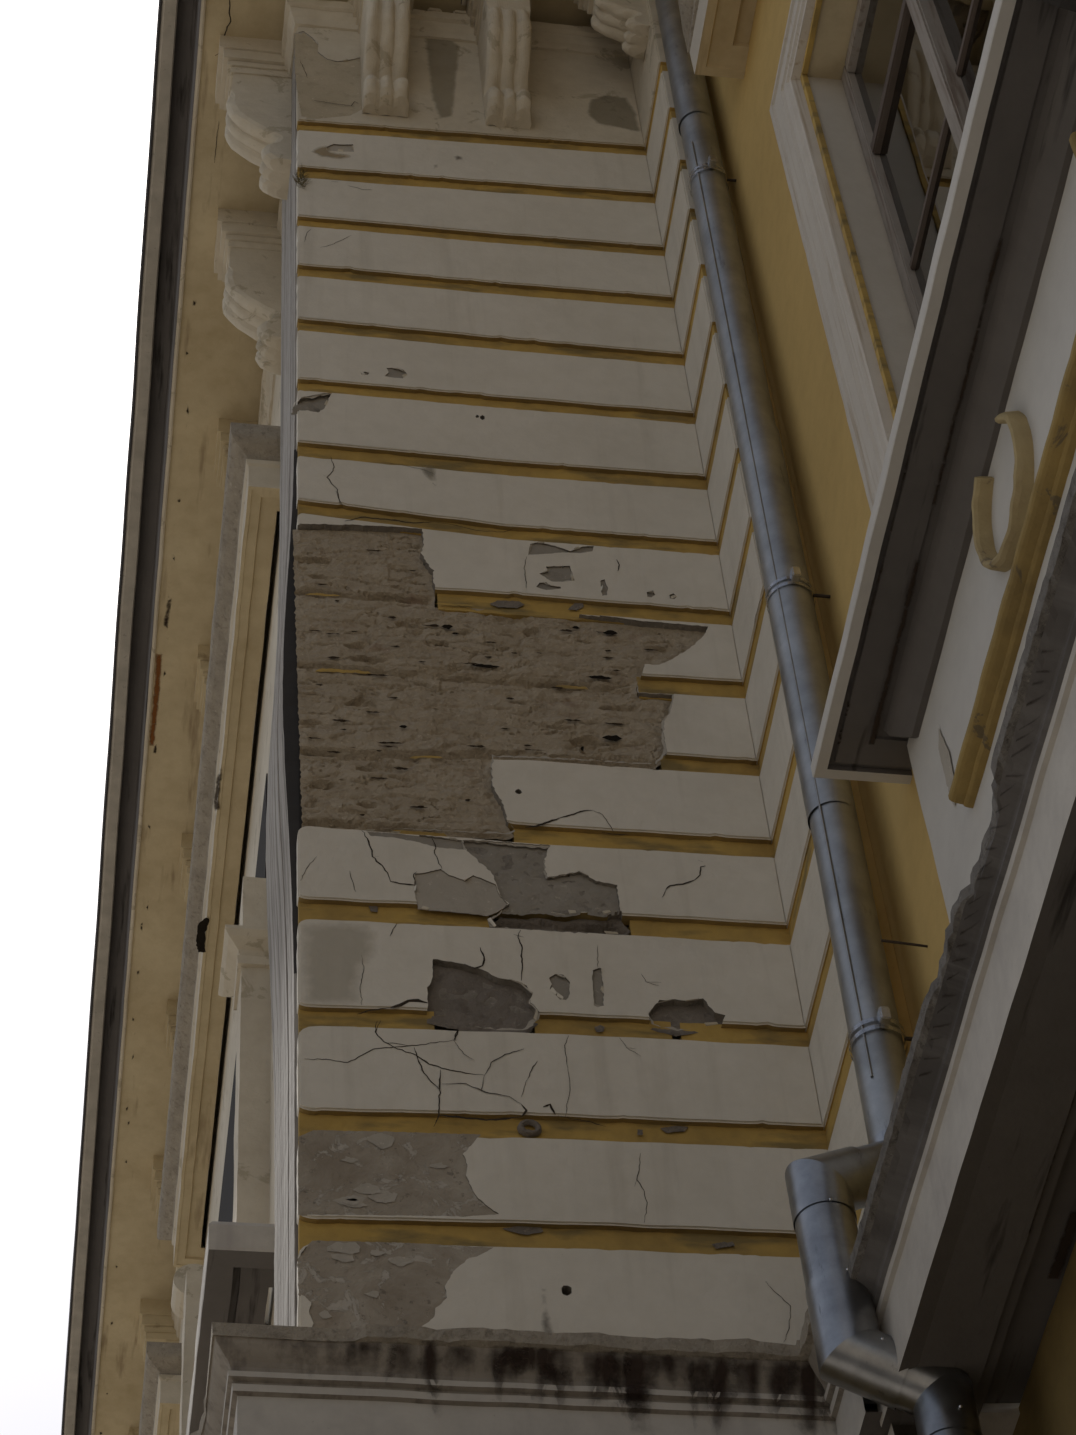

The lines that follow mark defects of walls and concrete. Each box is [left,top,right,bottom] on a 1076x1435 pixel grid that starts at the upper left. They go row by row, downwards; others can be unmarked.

flaking render [293,530,706,935]
crack [350,830,442,890]
crack [662,866,704,897]
crack [311,955,606,1127]
flaking render [427,965,540,1033]
peeling [550,974,570,1000]
flaking render [649,998,723,1036]
peeling [298,1130,543,1235]
peeling [297,1240,494,1329]
water stain [424,1343,436,1385]
water stain [492,1347,566,1386]
water stain [590,1352,816,1428]